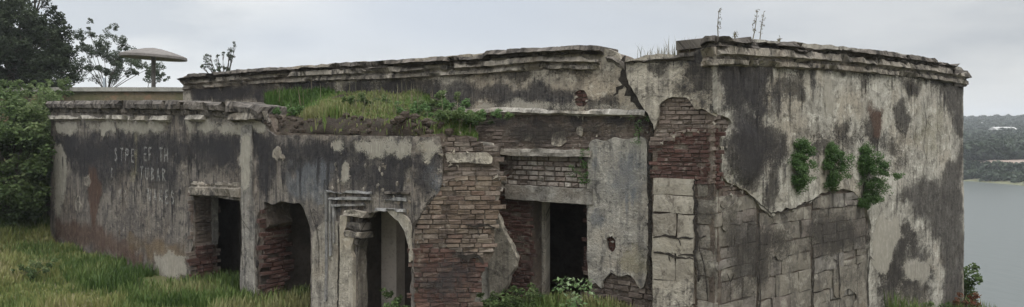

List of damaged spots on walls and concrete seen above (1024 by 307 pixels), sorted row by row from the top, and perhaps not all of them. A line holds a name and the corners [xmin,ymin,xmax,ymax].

leakage [52,128,442,221]
spalling [331,90,868,307]
crack [614,56,821,307]
leakage [647,48,965,307]